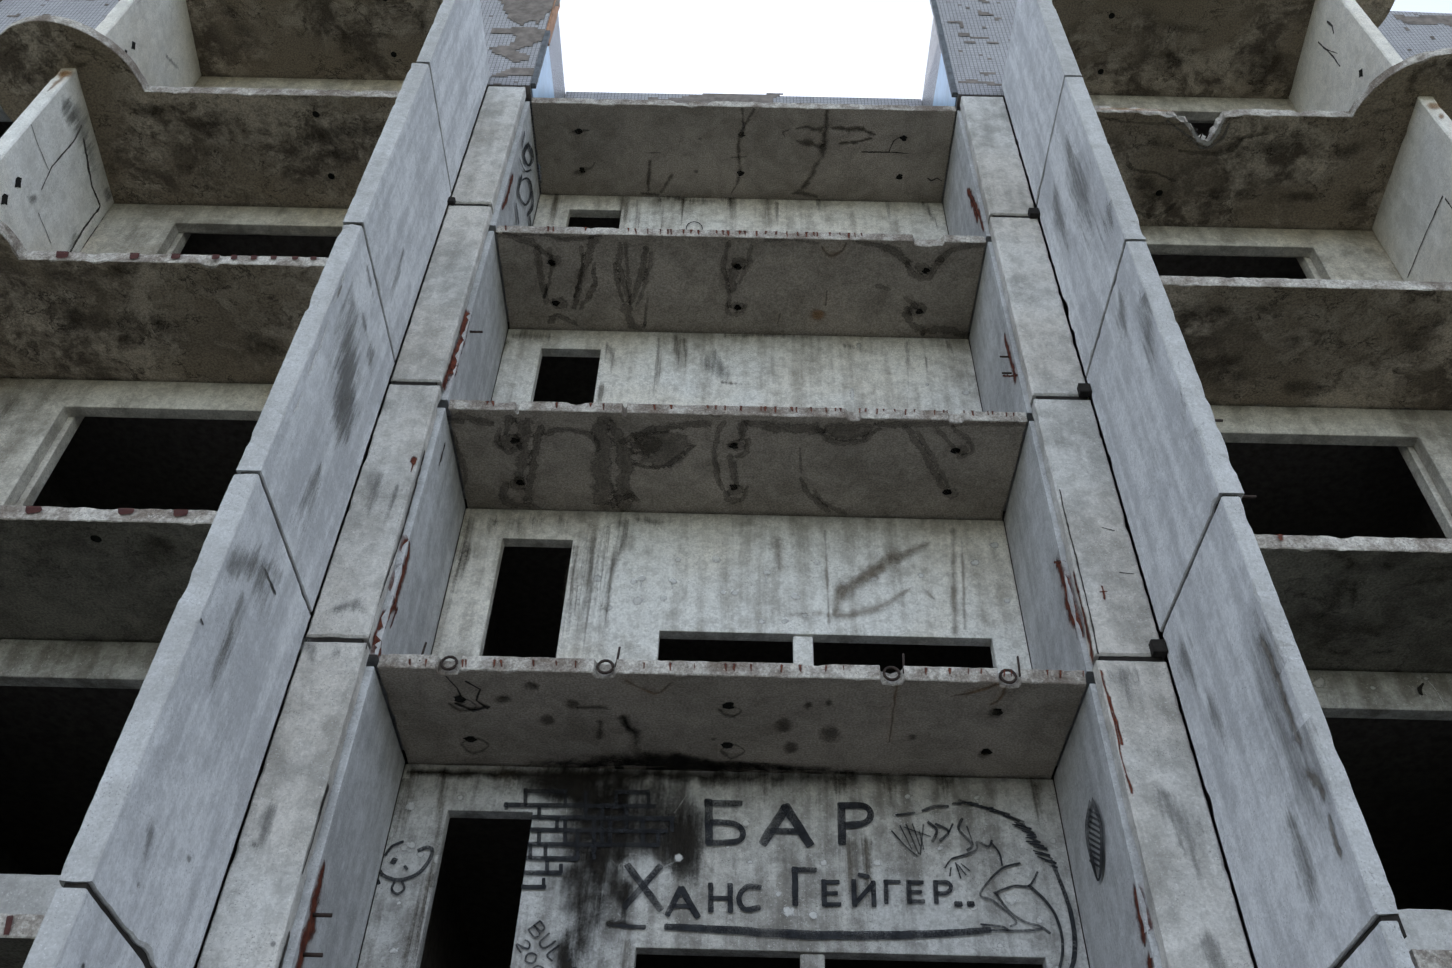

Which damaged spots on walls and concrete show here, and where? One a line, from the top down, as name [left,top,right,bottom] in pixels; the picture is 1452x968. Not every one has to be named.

peeling [489,0,560,77]
peeling [1393,14,1452,39]
peeling [648,93,783,103]
crack [31,124,105,252]
corrosion [1054,558,1133,794]
damp [620,716,639,743]
damp [400,738,855,968]
damp [846,838,871,886]
corrosion [278,860,325,968]